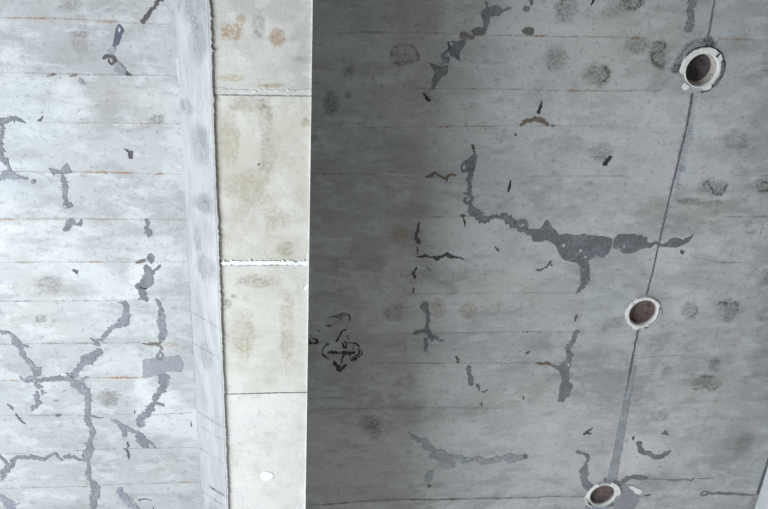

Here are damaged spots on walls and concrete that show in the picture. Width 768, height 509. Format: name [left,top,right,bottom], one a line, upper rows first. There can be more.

crack [102,0,164,76]
crack [429,0,534,90]
crack [0,116,73,209]
crack [143,218,153,238]
crack [425,144,693,293]
crack [411,223,464,352]
crack [0,230,202,509]
crack [535,330,579,402]
crack [408,432,528,470]
crack [622,441,768,497]